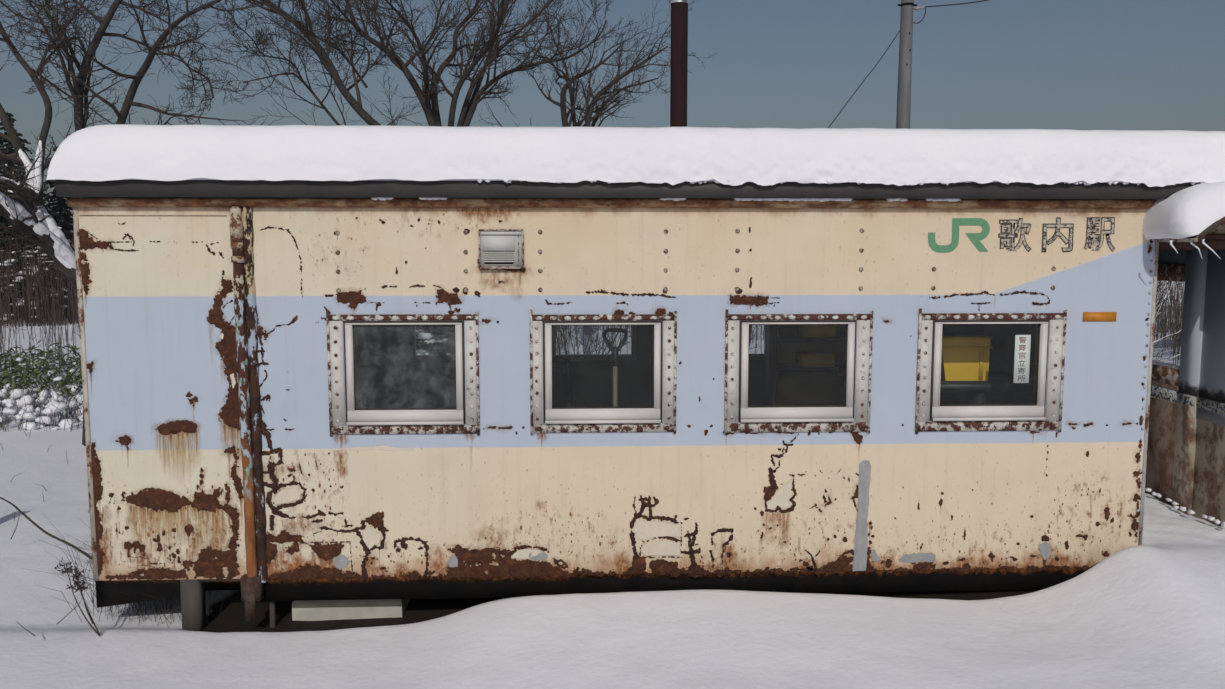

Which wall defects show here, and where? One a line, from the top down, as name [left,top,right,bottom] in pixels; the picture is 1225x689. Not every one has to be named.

rust [79,229,139,295]
rust [318,288,384,323]
rust [433,285,480,314]
rust [730,277,779,307]
rust [91,279,262,582]
rust [266,416,1143,584]